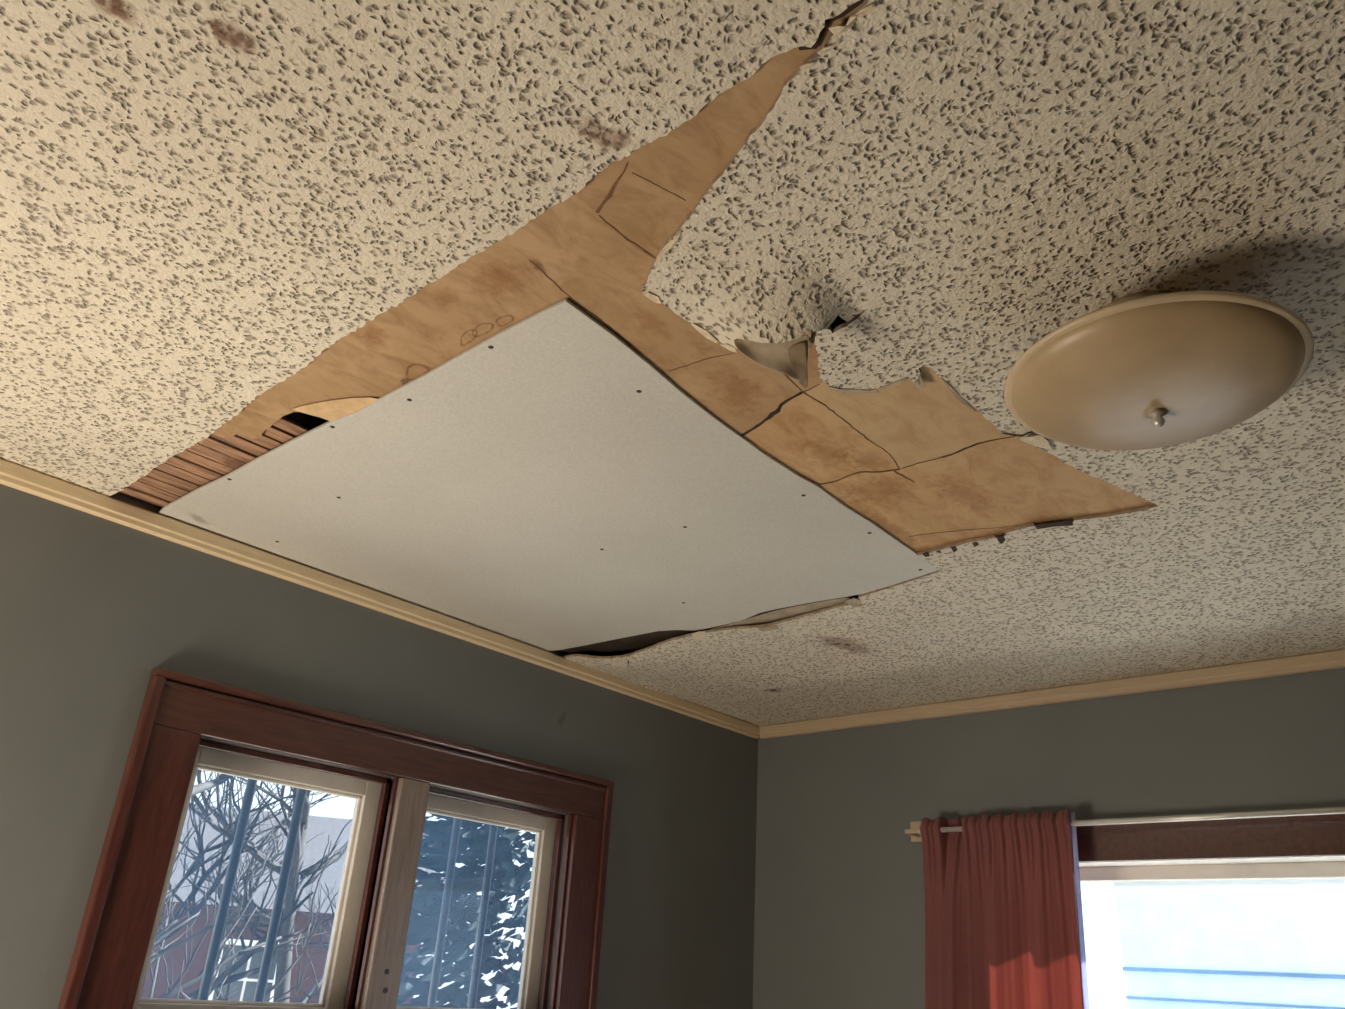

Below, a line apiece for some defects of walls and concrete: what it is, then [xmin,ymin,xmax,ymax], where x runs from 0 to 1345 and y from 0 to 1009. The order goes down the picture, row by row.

leakage [95,0,125,17]
leakage [212,21,252,47]
peeling [119,0,1154,557]